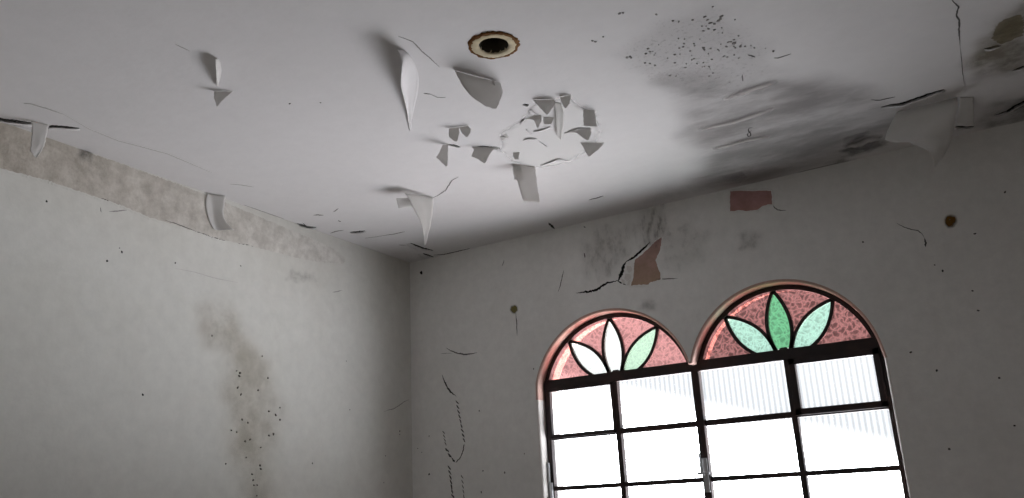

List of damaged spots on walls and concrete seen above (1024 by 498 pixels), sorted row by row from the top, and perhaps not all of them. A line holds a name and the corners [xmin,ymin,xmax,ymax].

leakage [644,6,766,77]
crack [875,0,1001,109]
peeling [214,59,233,107]
peeling [397,49,419,130]
peeling [455,71,503,109]
peeling [436,95,604,203]
flaking render [0,121,348,266]
peeling [396,193,433,245]
spalling [728,188,775,213]
corrosion [945,215,956,227]
crack [578,242,650,293]
spalling [621,235,664,288]